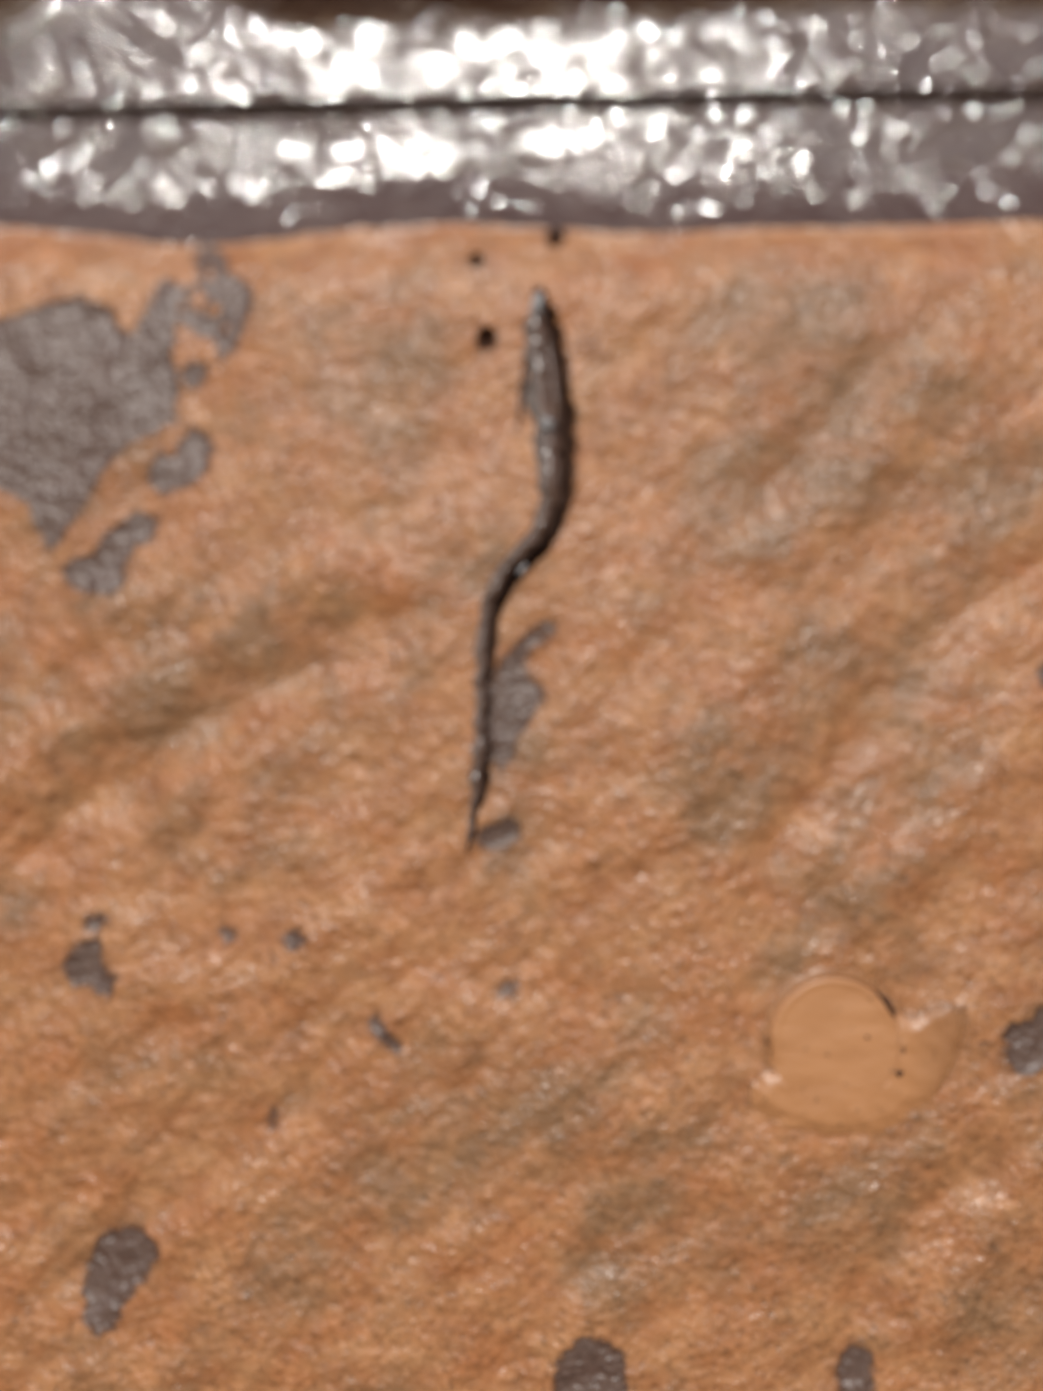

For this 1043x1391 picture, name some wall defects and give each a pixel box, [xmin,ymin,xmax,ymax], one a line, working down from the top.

peeling [0,243,253,550]
peeling [63,512,158,596]
crack [465,289,580,854]
peeling [62,913,117,995]
peeling [1003,1007,1043,1075]
peeling [82,1225,159,1336]
peeling [554,1337,628,1391]